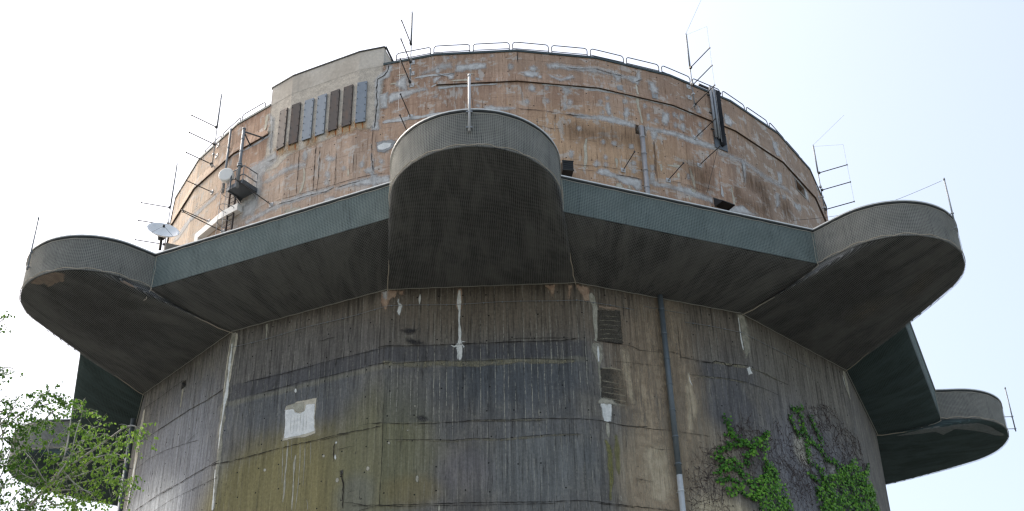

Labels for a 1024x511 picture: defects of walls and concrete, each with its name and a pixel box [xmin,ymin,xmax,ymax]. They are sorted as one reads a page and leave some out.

leakage [451,288,466,360]
leakage [598,311,698,511]